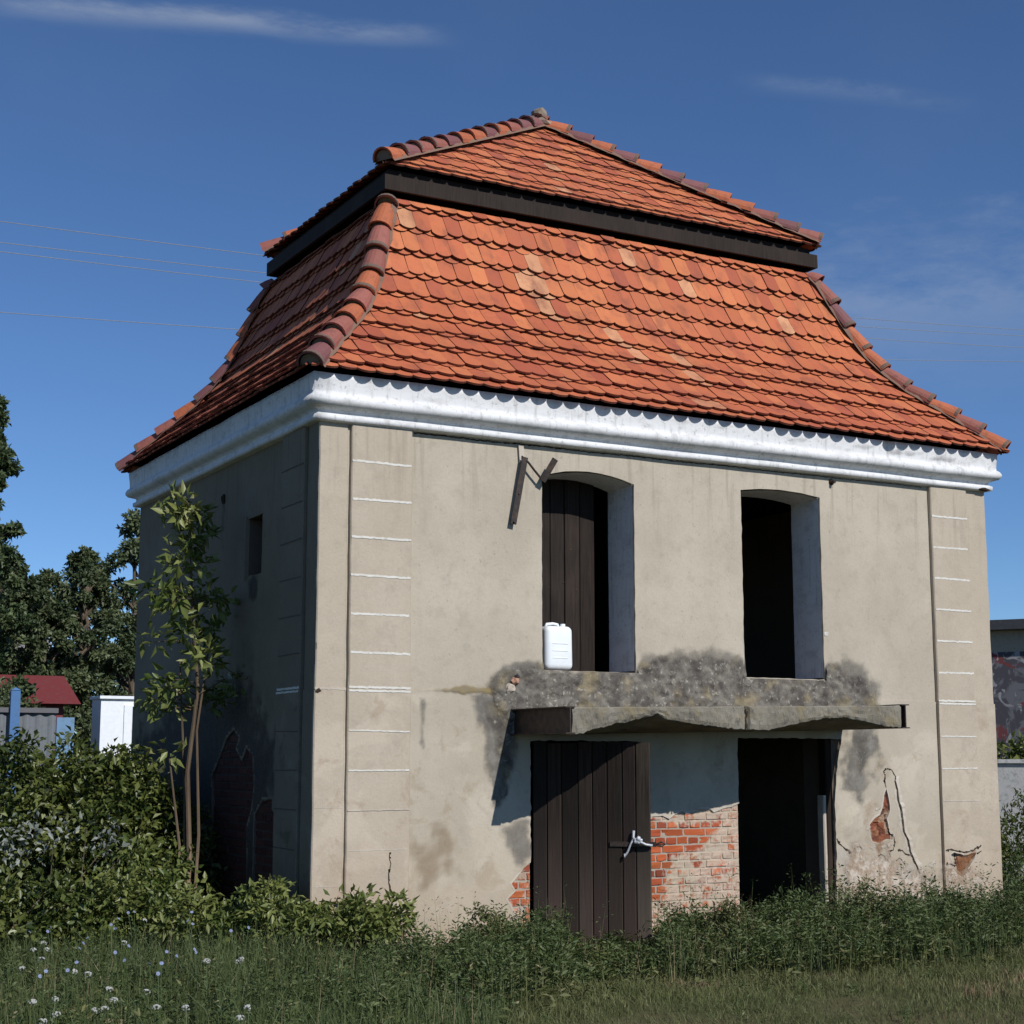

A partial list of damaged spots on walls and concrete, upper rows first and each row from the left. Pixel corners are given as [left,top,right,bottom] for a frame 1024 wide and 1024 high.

water stain [443,652,879,806]
spalling [210,730,274,899]
spalling [506,863,530,928]
water stain [506,820,531,863]
flaking render [651,801,740,937]
crack [838,768,981,874]
flaking render [840,788,984,907]